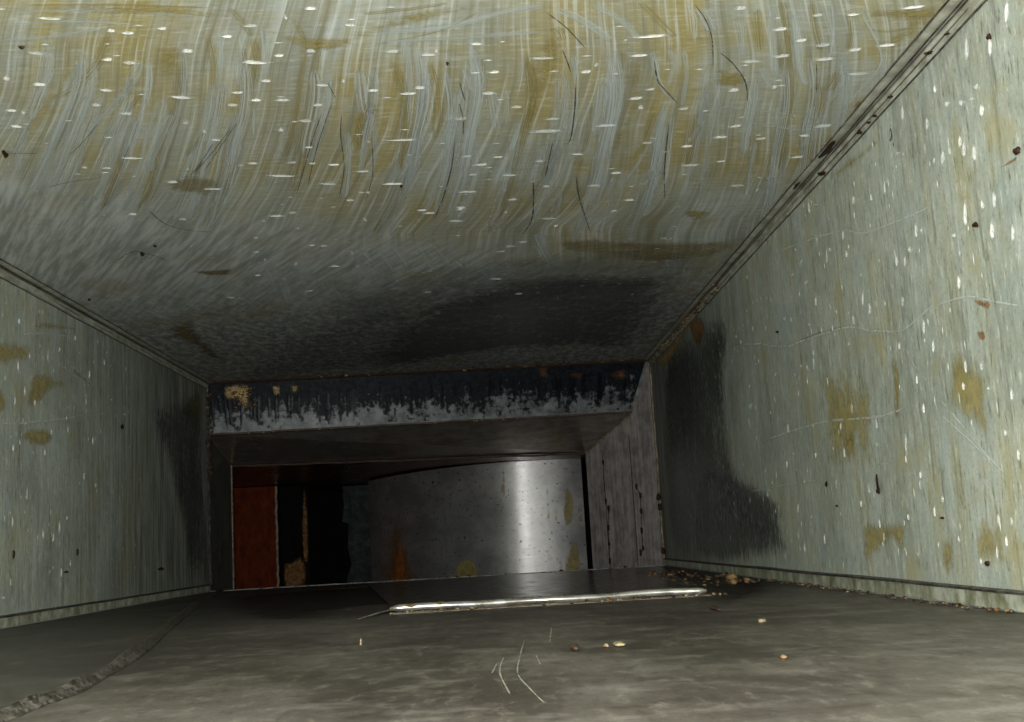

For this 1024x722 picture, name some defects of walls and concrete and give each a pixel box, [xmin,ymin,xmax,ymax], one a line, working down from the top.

rust [817,141,835,176]
water stain [0,375,52,410]
rust [225,385,259,409]
water stain [954,361,989,424]
water stain [826,381,876,457]
water stain [866,514,909,554]